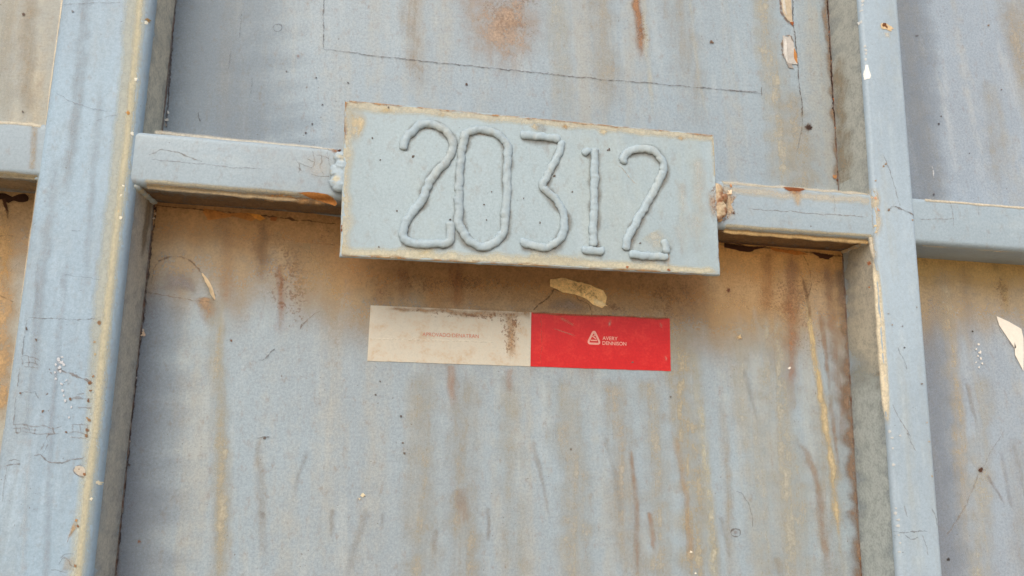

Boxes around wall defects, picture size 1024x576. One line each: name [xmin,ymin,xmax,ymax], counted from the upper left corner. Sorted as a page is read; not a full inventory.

rust [633,0,643,48]
peeling [779,0,798,69]
rust [823,0,838,181]
rust [0,178,38,408]
spalling [534,278,607,310]
rust [144,101,861,576]
peeling [997,316,1024,369]